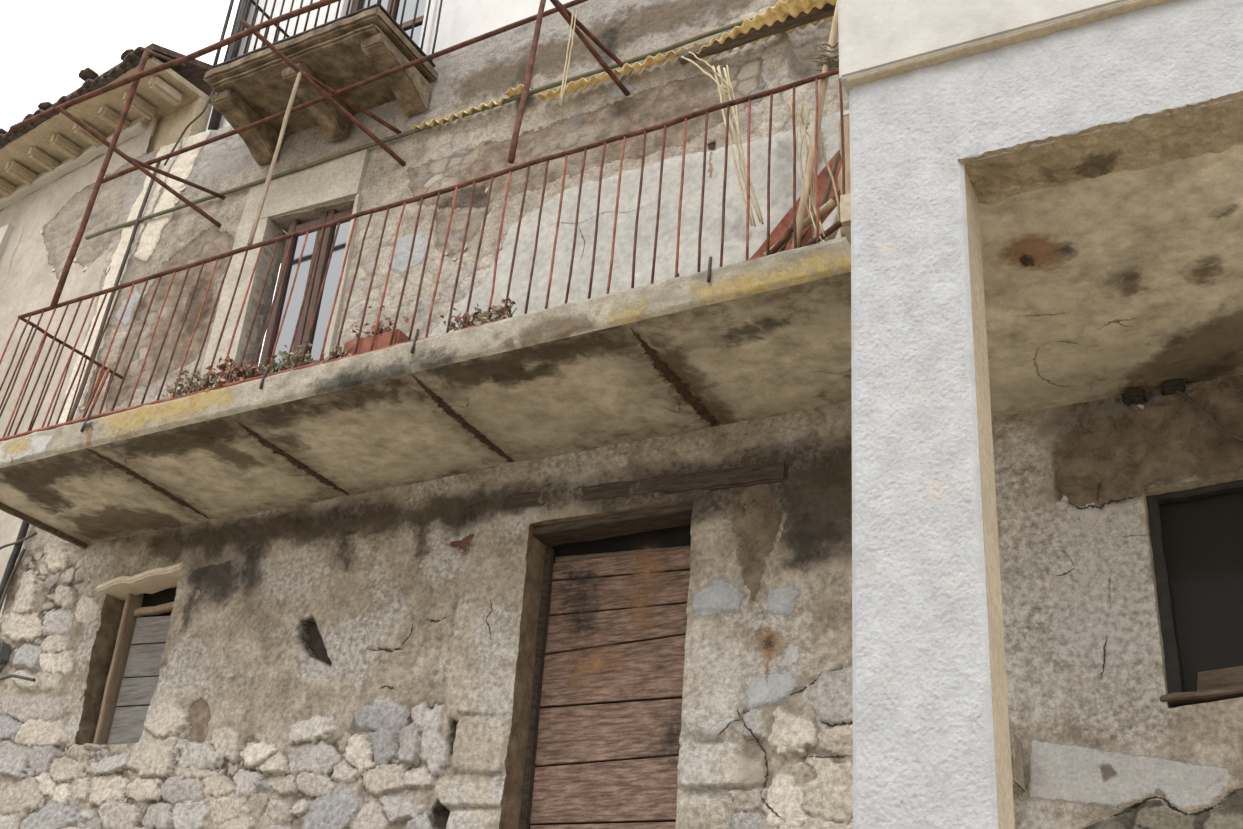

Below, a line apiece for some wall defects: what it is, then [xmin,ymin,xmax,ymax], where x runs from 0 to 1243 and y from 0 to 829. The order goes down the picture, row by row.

peeling [407,56,849,337]
spalling [0,128,235,464]
water stain [258,318,630,448]
crack [411,374,515,462]
crack [631,328,720,427]
water stain [652,342,735,424]
water stain [729,319,781,339]
water stain [2,420,524,621]
rust [760,632,777,683]